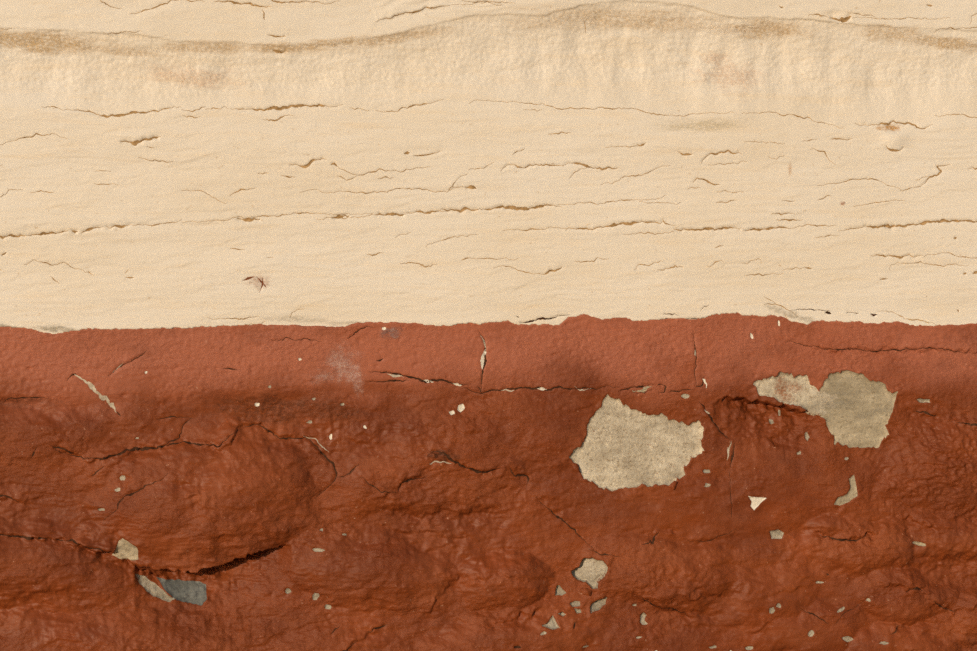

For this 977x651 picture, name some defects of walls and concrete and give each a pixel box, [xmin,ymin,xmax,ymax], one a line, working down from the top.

crack [100,0,335,53]
crack [808,5,977,32]
crack [0,100,977,282]
crack [745,258,971,353]
crack [67,351,146,415]
peeling [569,395,704,491]
peeling [753,370,898,460]
crack [31,416,619,557]
peeling [834,475,857,506]
peeling [112,538,138,560]
peeling [135,574,207,606]
peeling [540,558,608,635]